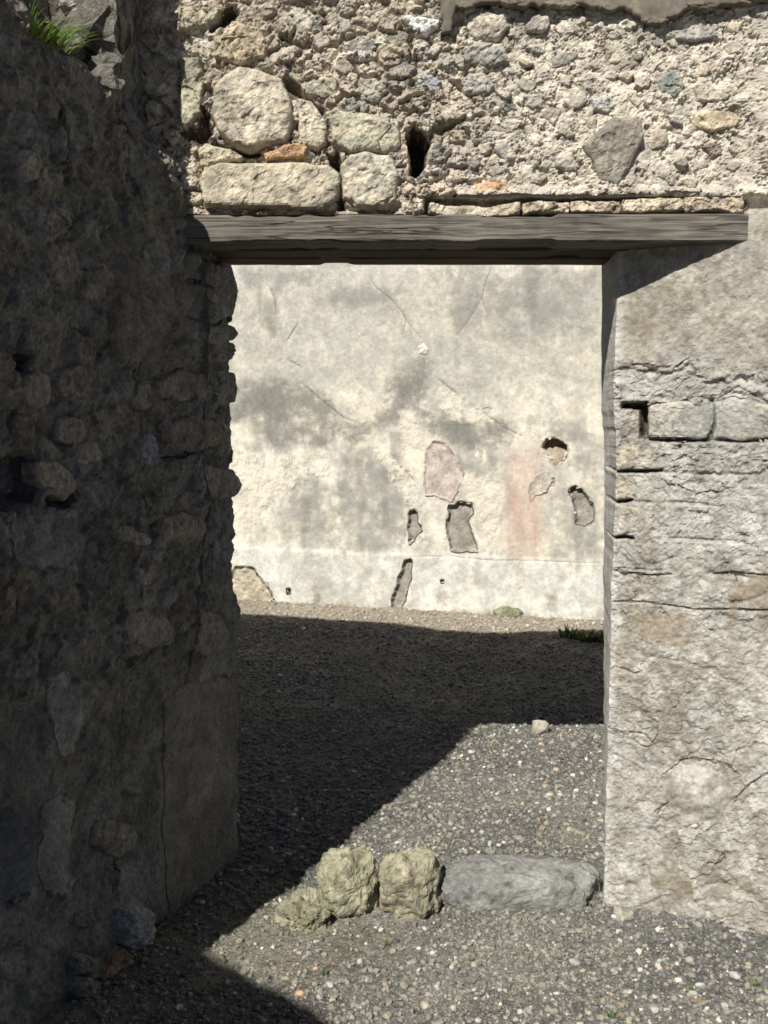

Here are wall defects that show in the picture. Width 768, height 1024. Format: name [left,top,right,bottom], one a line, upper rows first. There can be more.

flaking render [421,438,480,553]
flaking render [528,435,597,526]
flaking render [232,565,291,601]
flaking render [390,508,424,607]
crack [667,754,768,804]